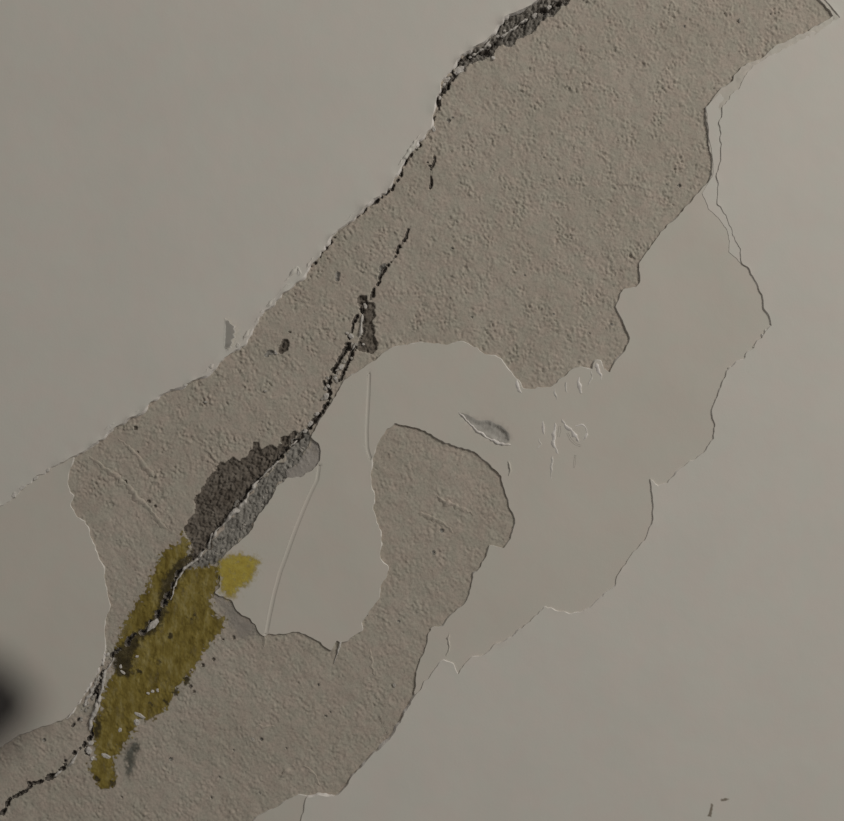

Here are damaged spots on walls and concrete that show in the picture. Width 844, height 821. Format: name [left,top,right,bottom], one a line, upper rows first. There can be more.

crack [311,0,569,267]
leakage [86,531,260,789]
crack [0,226,411,815]
peeling [0,424,514,821]
peeling [39,0,833,694]